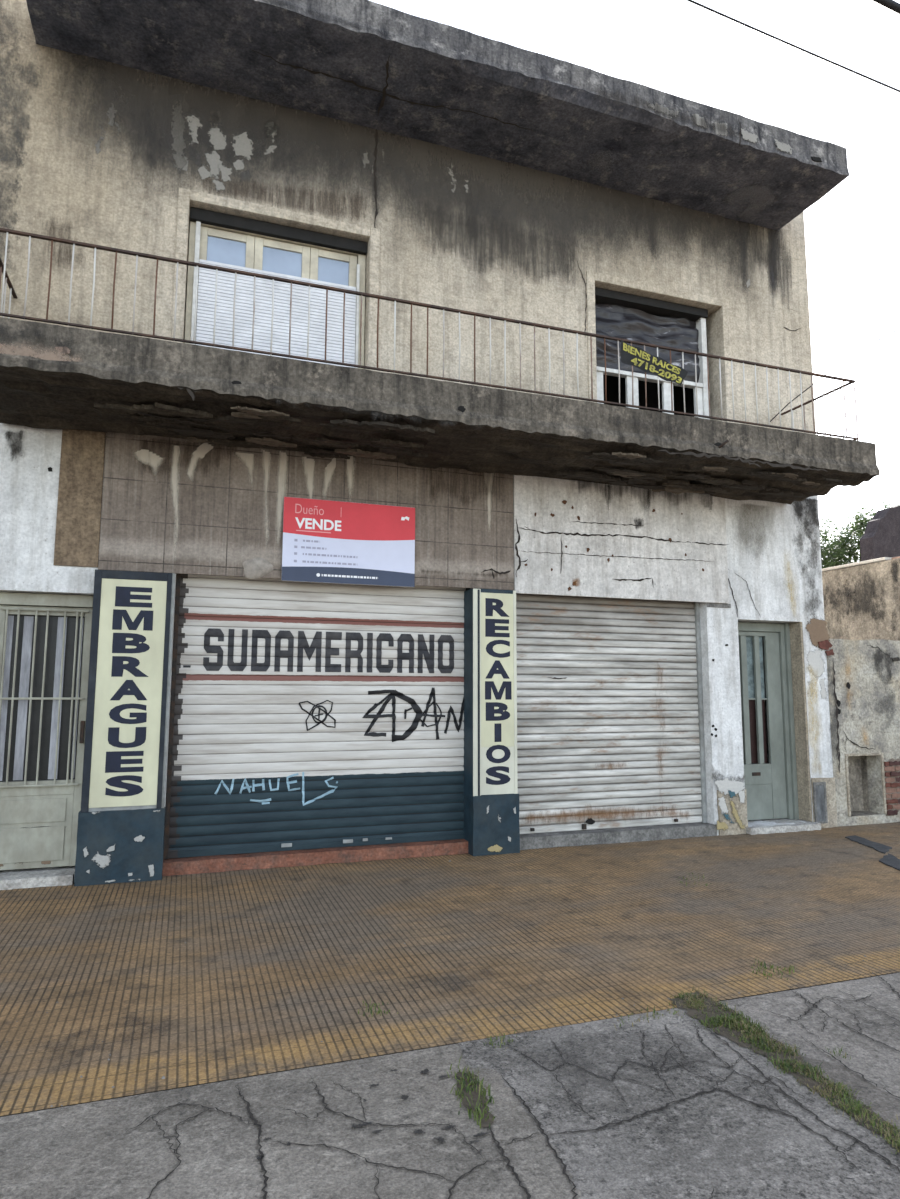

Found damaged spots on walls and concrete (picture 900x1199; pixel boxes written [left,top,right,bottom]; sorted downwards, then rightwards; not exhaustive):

leakage [0,24,38,250]
peeling [170,107,277,192]
leakage [203,179,362,218]
leakage [433,197,574,275]
leakage [727,186,790,294]
crack [483,520,729,587]
crack [728,573,760,616]
peeling [806,618,841,714]
peeling [715,777,746,830]
flaking render [884,758,900,816]
peeling [83,845,154,883]